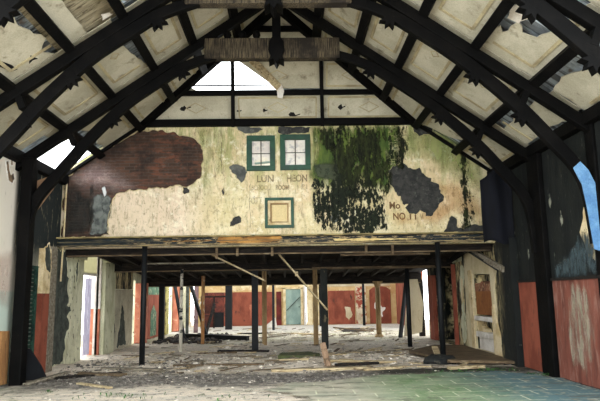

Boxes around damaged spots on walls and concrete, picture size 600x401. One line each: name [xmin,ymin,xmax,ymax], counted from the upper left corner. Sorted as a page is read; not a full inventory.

spalling [60,129,204,237]
spalling [229,164,247,183]
mould [311,125,408,233]
spalling [388,163,444,217]
mould [460,154,476,230]
spalling [444,215,483,232]
damp [555,233,597,278]